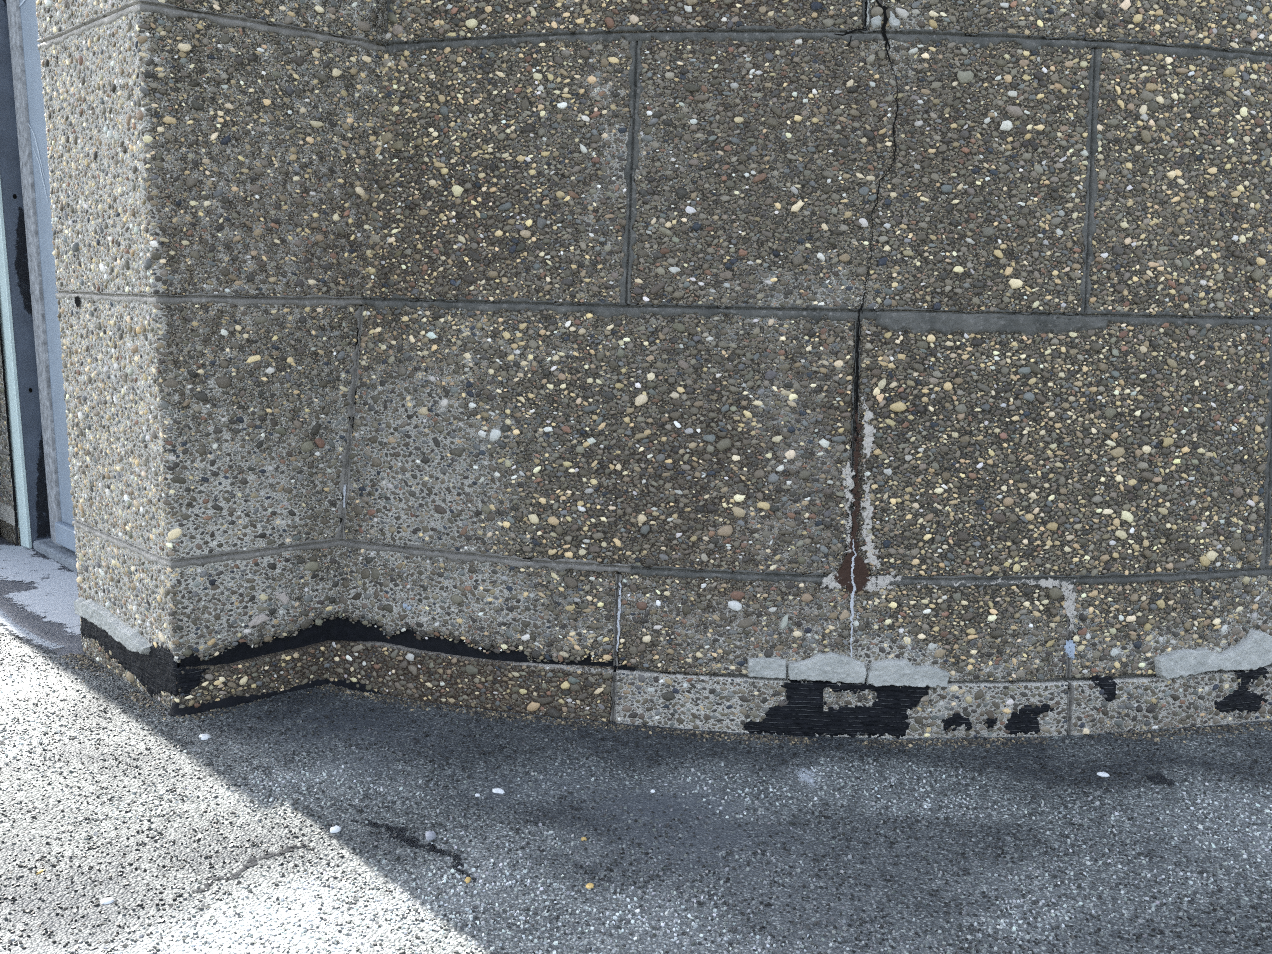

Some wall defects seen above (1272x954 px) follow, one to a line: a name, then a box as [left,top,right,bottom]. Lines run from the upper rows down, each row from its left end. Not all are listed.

crack [834,0,901,483]
rust [834,399,872,657]
leakage [842,396,938,595]
spalling [80,615,635,697]
leakage [820,572,843,592]
peeling [743,680,930,738]
peeling [942,703,1054,736]
leakage [954,577,1077,660]
peeling [1092,673,1117,702]
peeling [1214,667,1269,716]